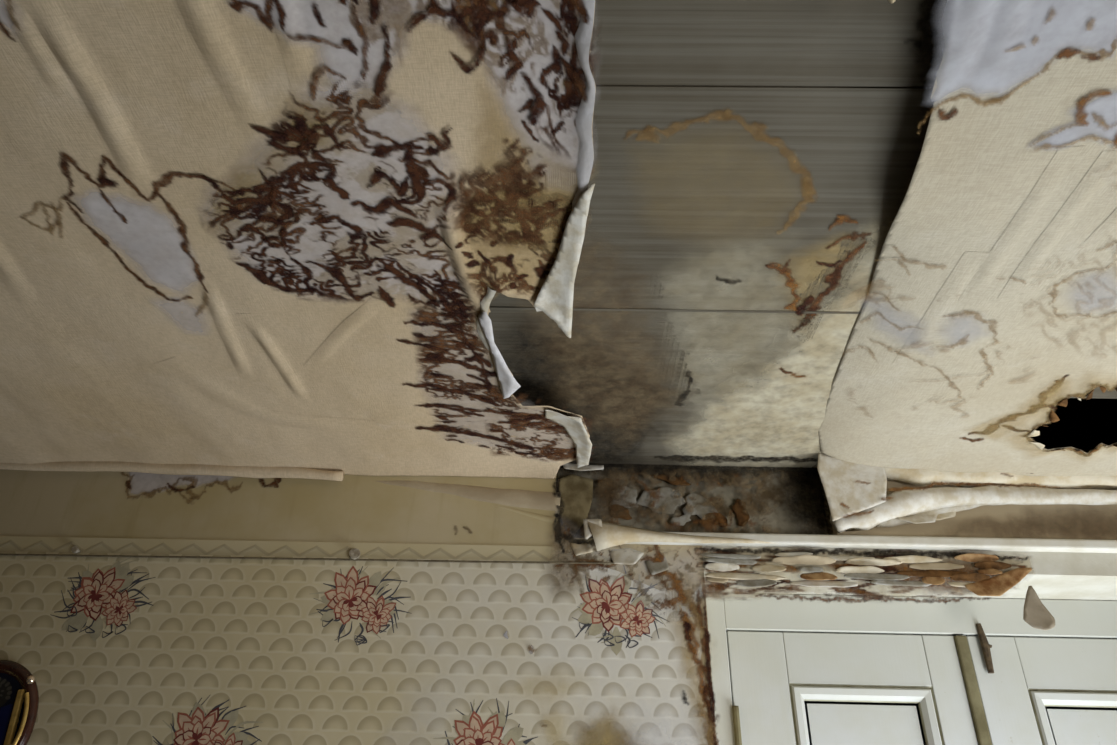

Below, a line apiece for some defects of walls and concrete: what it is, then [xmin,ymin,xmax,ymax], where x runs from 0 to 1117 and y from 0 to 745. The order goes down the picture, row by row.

water stain [22,0,896,655]
peeling [1027,386,1117,454]
peeling [555,463,1033,604]